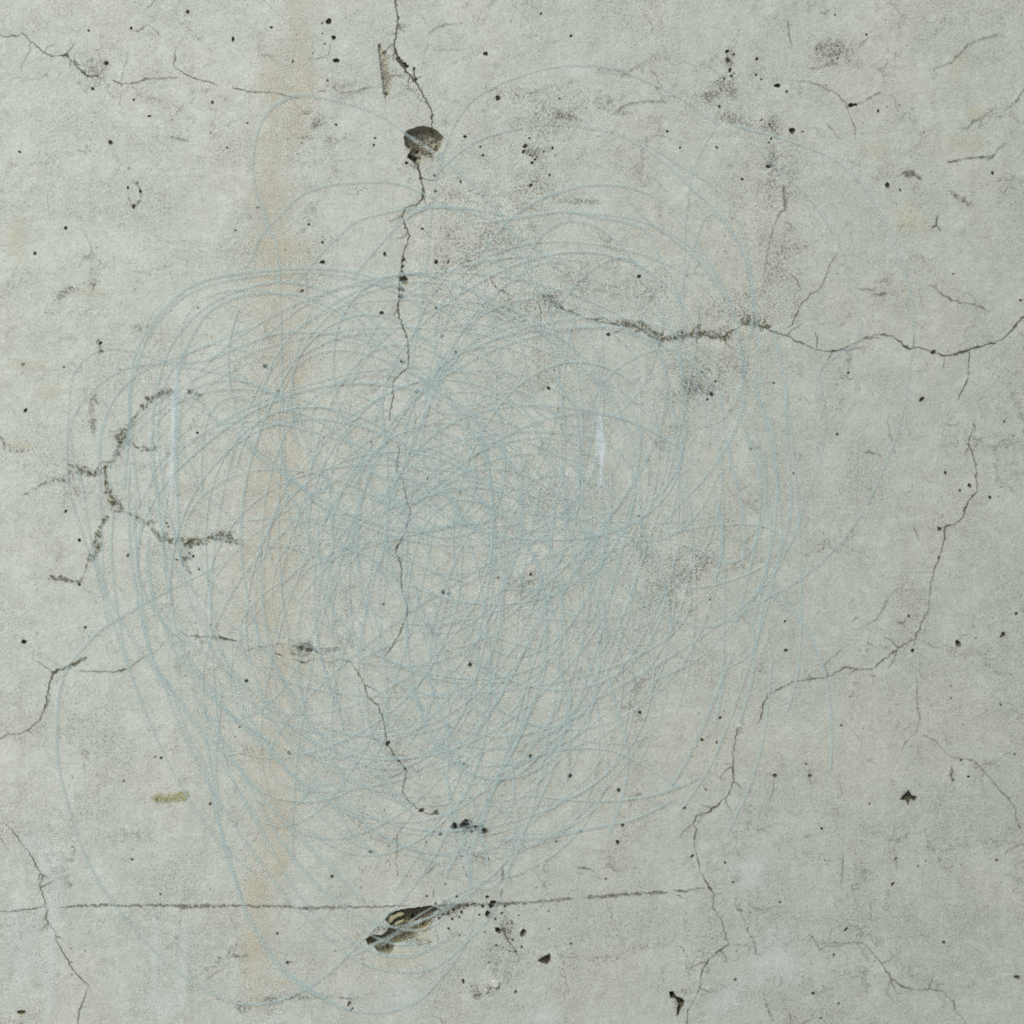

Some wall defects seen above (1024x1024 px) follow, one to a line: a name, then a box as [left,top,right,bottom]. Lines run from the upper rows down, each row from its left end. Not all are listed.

spalling [403,126,444,194]
crack [765,185,791,266]
crack [24,388,240,584]
crack [386,162,433,654]
crack [539,254,1024,399]
crack [1,419,979,1024]
crack [900,676,1024,853]
spalling [366,895,526,956]